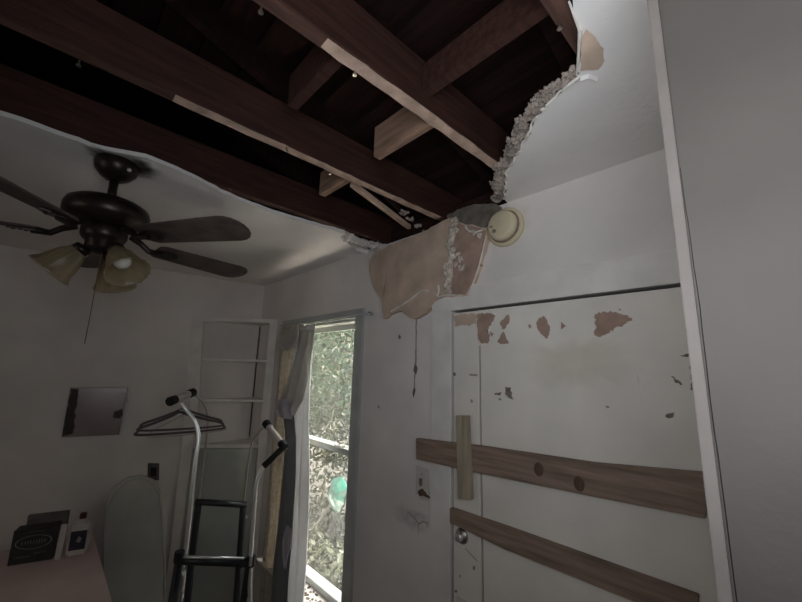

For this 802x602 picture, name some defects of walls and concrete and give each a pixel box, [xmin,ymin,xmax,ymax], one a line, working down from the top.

flaking render [489,65,598,203]
flaking render [341,231,386,254]
peeling [454,311,511,345]
peeling [528,315,551,339]
peeling [593,309,634,339]
peeling [494,386,514,401]